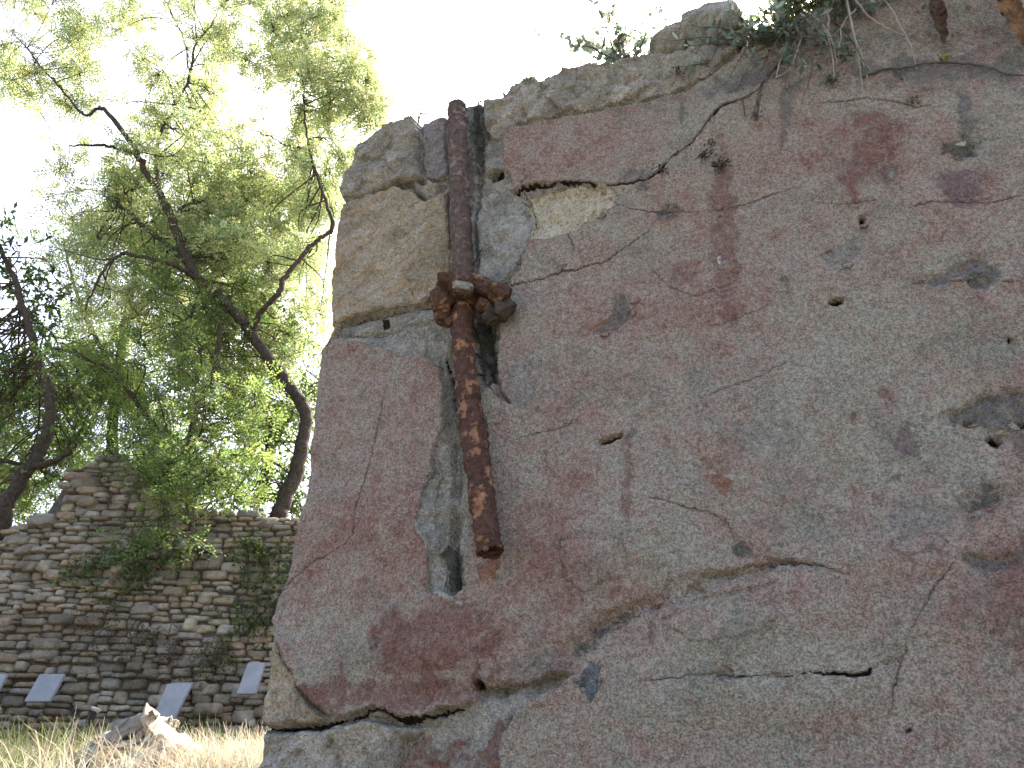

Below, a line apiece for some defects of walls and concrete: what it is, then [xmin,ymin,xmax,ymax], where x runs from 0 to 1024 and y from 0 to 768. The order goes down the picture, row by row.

crack [822,97,935,108]
spalling [521,182,618,239]
crack [511,81,790,286]
crack [914,195,1021,206]
spalling [913,259,1014,288]
spalling [950,391,1024,432]
crack [282,385,386,592]
crack [651,562,954,714]
crack [271,707,465,732]